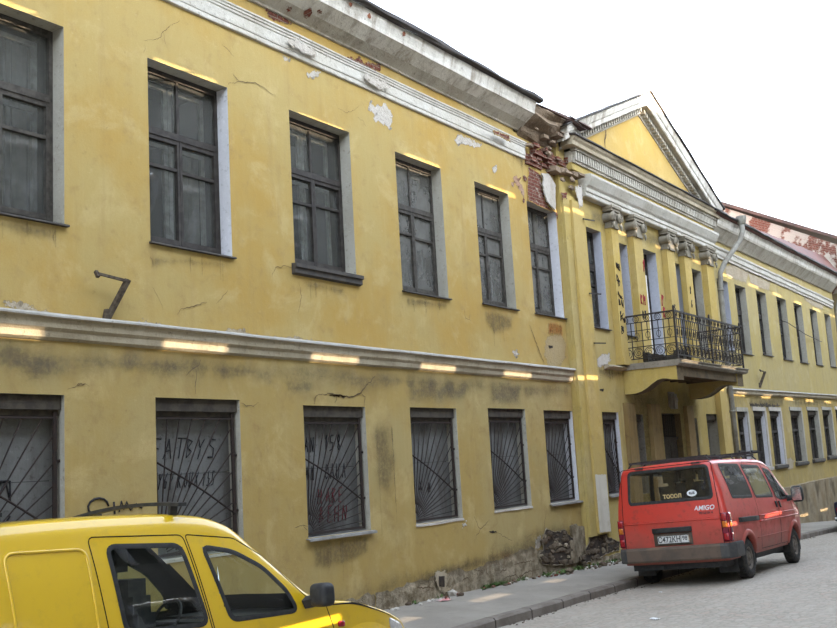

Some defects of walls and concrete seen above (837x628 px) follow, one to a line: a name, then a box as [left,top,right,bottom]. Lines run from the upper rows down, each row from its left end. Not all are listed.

peeling [368,100,393,130]
peeling [454,134,482,148]
spalling [511,156,583,219]
crack [314,376,375,404]
spalling [345,524,621,610]